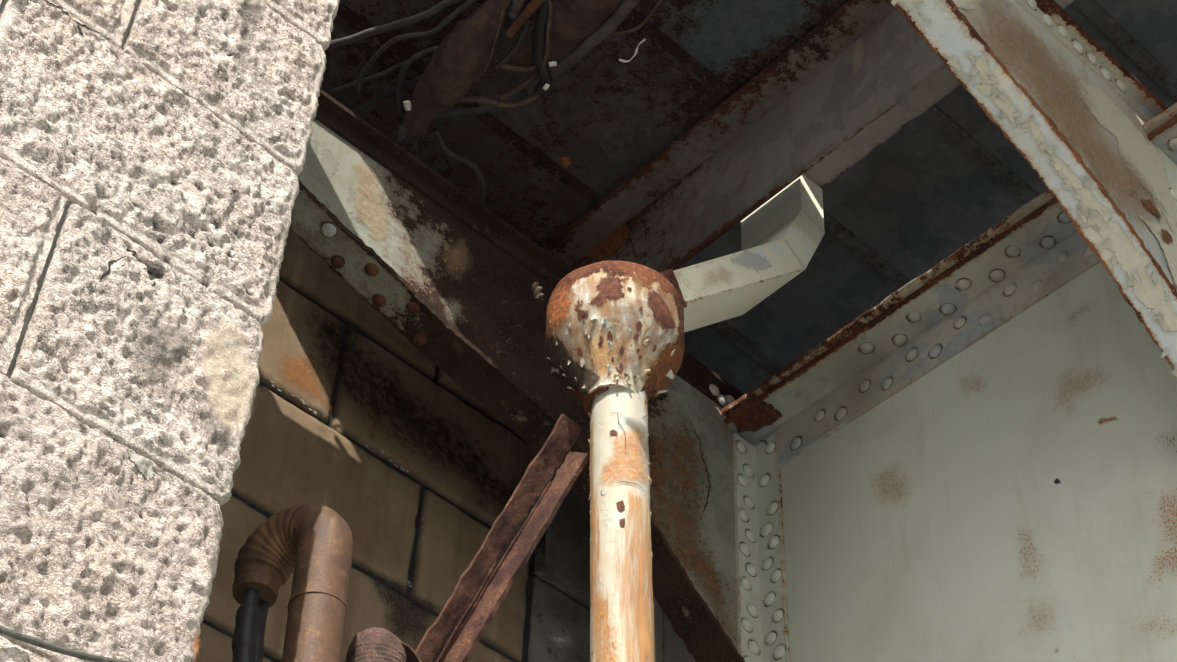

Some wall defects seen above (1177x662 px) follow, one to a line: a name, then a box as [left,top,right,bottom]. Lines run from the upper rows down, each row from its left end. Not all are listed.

crack [45,0,108,41]
peeling [891,0,932,24]
peeling [947,55,1177,332]
crack [100,256,126,281]
rust [544,277,684,399]
rust [590,420,740,662]
rust [1145,492,1177,589]